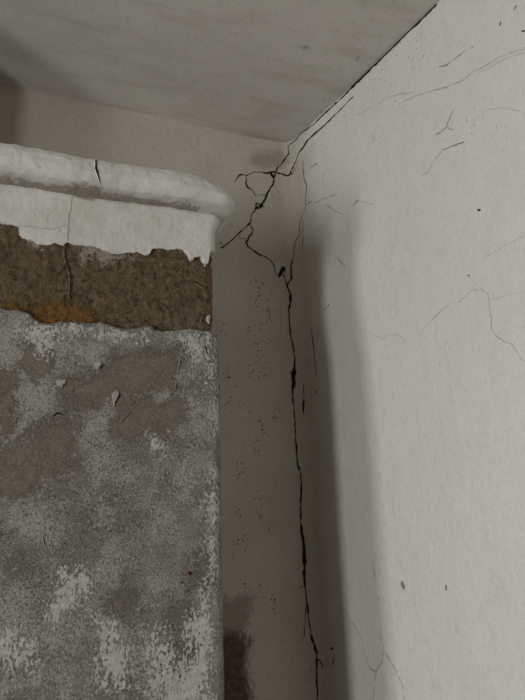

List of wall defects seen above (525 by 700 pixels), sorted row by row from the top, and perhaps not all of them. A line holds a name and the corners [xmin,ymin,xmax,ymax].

crack [93,159,101,186]
corrosion [5,295,96,324]
crack [220,4,525,700]
flaking render [0,224,236,700]
damp [223,596,254,700]